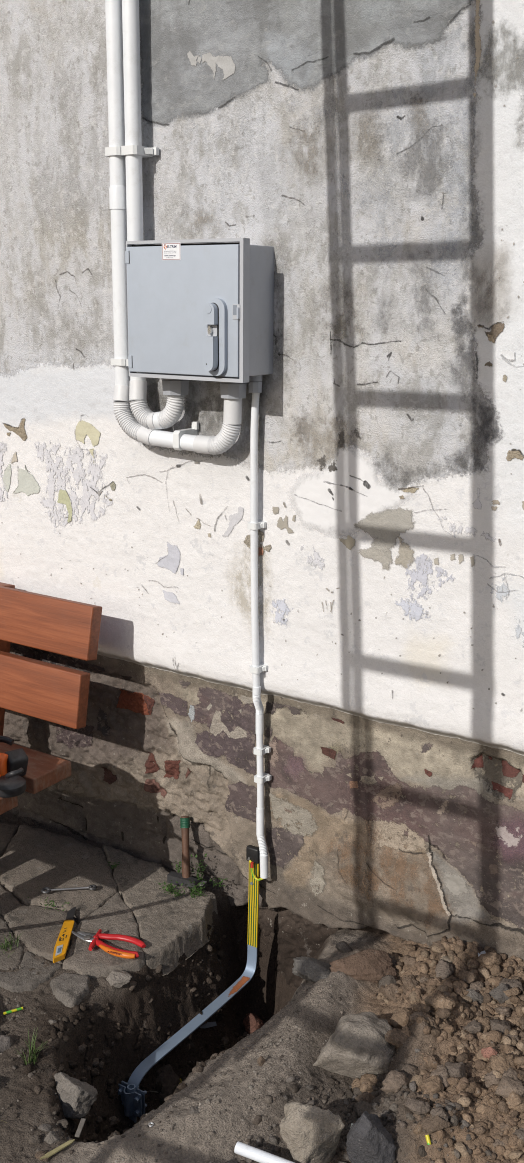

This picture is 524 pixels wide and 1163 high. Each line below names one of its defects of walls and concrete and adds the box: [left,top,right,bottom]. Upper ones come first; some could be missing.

leakage [472,28,524,85]
peeling [0,0,115,376]
leakage [467,190,477,246]
peeling [139,0,524,625]
peeling [0,415,116,527]
leakage [298,418,361,472]
leakage [453,347,497,468]
peeling [55,675,524,929]
crack [397,835,524,937]